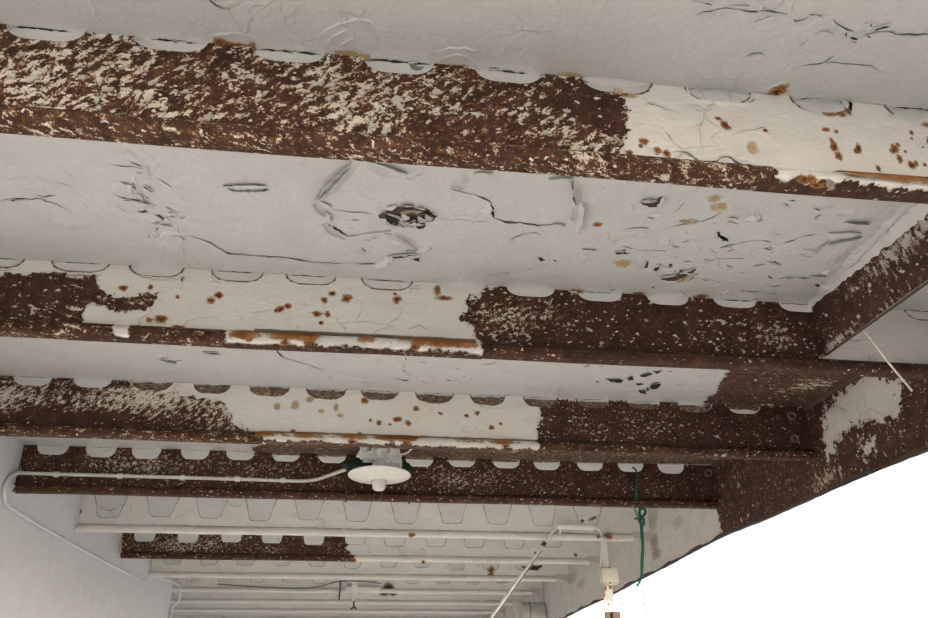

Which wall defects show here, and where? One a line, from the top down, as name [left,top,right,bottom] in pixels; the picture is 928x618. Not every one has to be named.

crack [696,0,928,73]
rust [0,24,928,211]
crack [1,182,71,212]
peeling [117,162,196,240]
peeling [313,161,437,270]
crack [439,189,555,244]
peeling [549,177,585,235]
peeling [630,196,665,222]
peeling [642,205,793,300]
rust [0,213,928,534]
peeling [596,369,673,394]
rust [120,533,356,562]